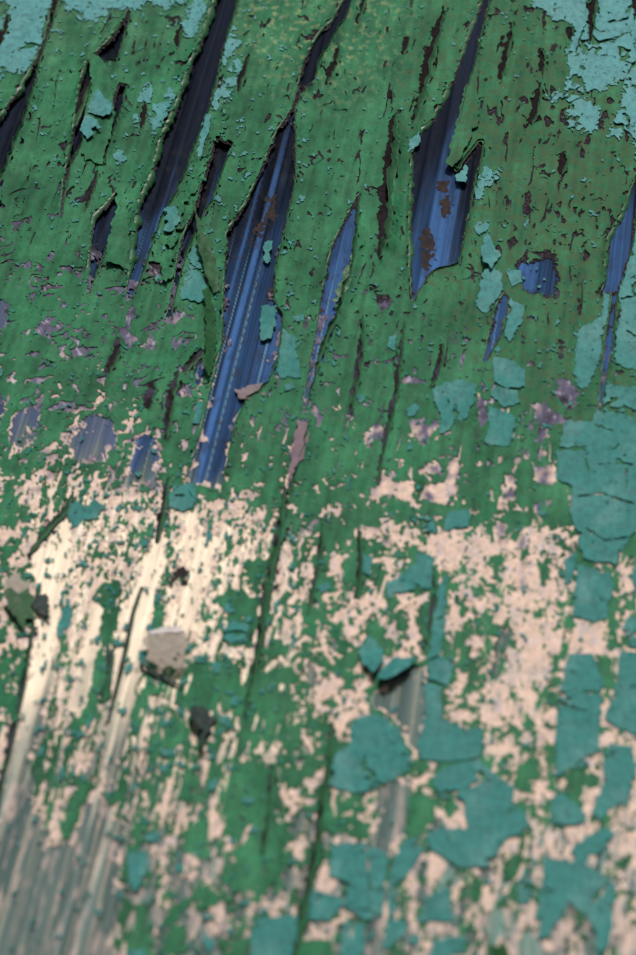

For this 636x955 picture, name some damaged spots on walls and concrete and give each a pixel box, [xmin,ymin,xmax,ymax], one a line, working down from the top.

peeling [80,52,127,165]
peeling [0,0,209,75]
peeling [132,81,176,135]
peeling [197,25,243,156]
peeling [408,132,421,152]
peeling [445,84,500,205]
peeling [530,0,636,160]
peeling [106,182,130,271]
peeling [163,206,181,237]
peeling [176,200,221,424]
peeling [203,220,636,955]
peeling [0,434,269,955]